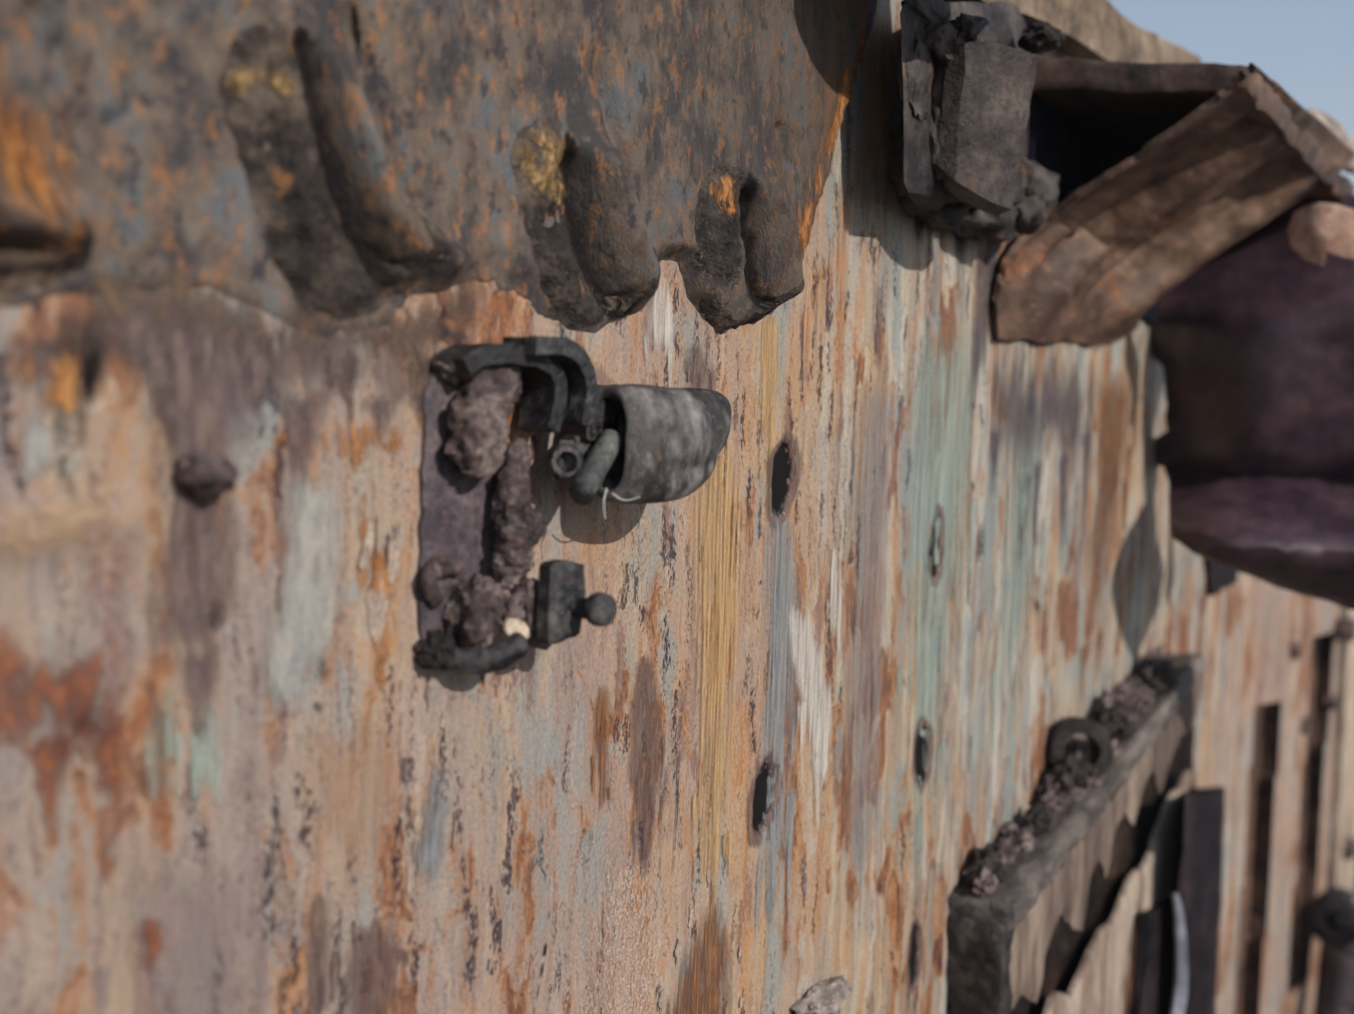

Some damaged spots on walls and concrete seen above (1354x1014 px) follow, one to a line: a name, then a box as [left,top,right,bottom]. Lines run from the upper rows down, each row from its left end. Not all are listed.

rust [0,105,69,212]
rust [798,171,822,262]
peeling [357,516,401,646]
peeling [503,618,531,639]
rust [0,634,122,876]
peeling [406,775,456,895]
peeling [658,904,744,1014]